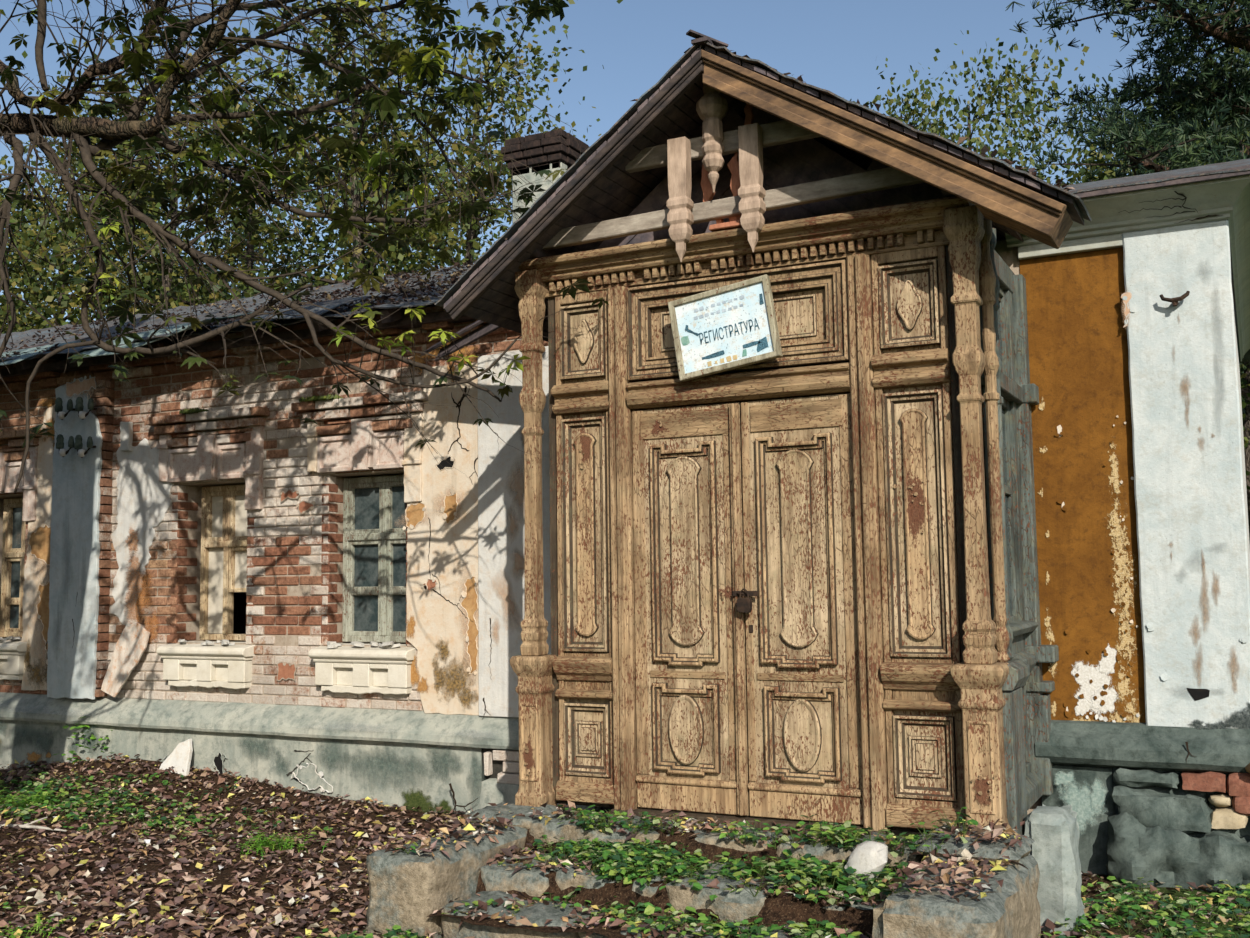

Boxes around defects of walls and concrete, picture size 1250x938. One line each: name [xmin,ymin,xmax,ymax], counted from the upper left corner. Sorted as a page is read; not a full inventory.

spalling [435,454,455,471]
spalling [403,488,460,530]
spalling [28,523,51,566]
spalling [420,578,438,593]
peeling [1051,415,1155,723]
spalling [36,581,50,665]
spalling [457,576,479,675]
peeling [1044,608,1070,645]
crack [286,750,318,776]